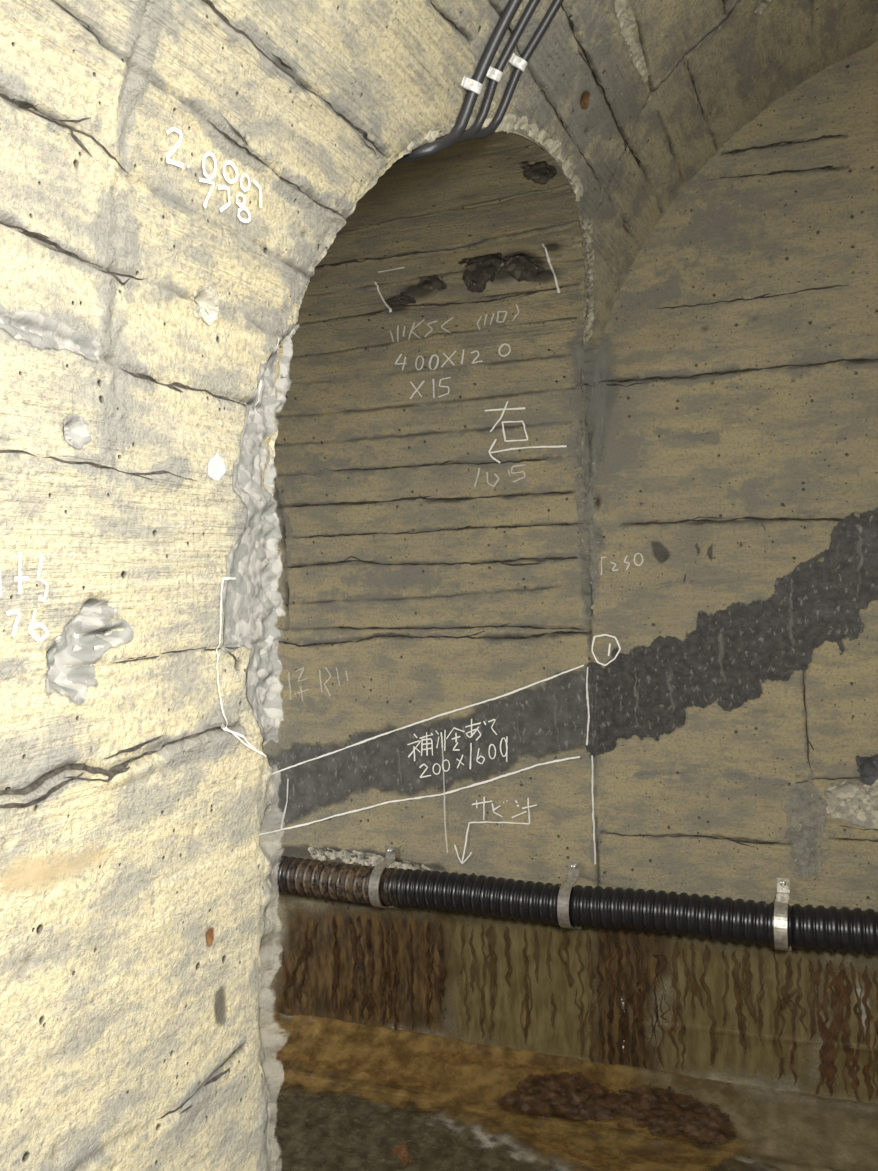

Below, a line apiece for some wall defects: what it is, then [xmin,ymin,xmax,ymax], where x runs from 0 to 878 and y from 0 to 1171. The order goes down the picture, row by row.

crack [202,0,385,156]
crack [0,93,127,172]
crack [207,116,347,220]
spalling [458,252,545,293]
spalling [221,324,299,751]
spalling [46,599,134,704]
crack [0,725,232,808]
spalling [824,754,878,829]
rust [258,905,878,1171]
water stain [856,988,869,1034]
water stain [265,1077,553,1171]
water stain [642,1067,878,1171]